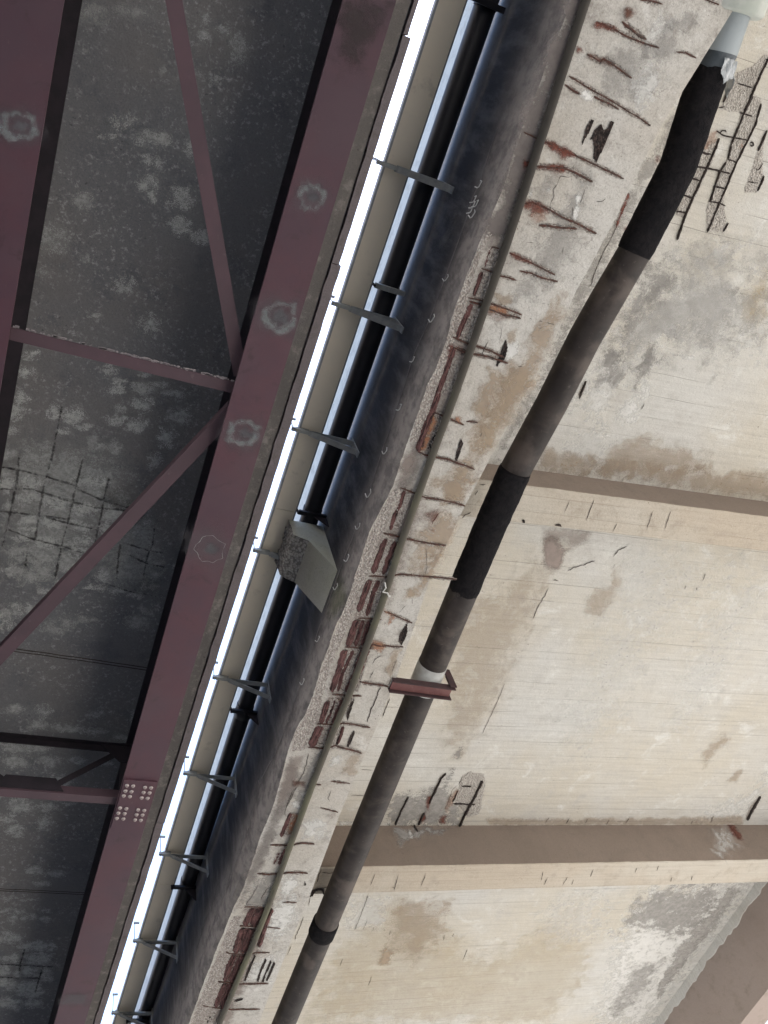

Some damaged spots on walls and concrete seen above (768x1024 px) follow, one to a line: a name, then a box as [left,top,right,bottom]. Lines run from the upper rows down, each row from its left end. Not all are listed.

spalling [596,21,659,49]
water stain [0,112,38,141]
rust [524,200,548,217]
rust [523,141,574,173]
spalling [524,75,651,183]
spalling [676,54,768,240]
spalling [409,232,558,470]
water stain [565,263,767,466]
crack [0,407,164,597]
spalling [290,487,465,754]
crack [533,524,627,618]
spalling [191,901,297,1024]